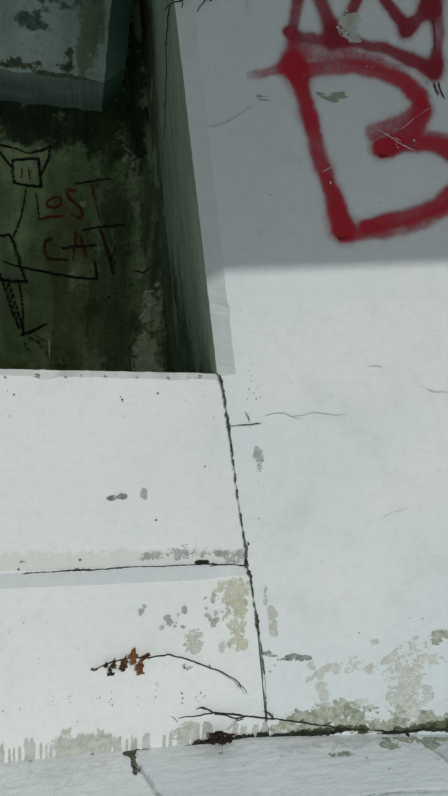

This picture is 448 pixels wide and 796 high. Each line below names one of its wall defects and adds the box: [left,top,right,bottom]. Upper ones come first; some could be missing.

water stain [14,0,81,31]
peeling [336,9,362,43]
water stain [131,280,166,372]
peeling [159,604,203,655]
peeling [204,577,250,653]
peeling [233,630,448,737]
peeling [0,721,150,775]
peeling [162,721,213,747]